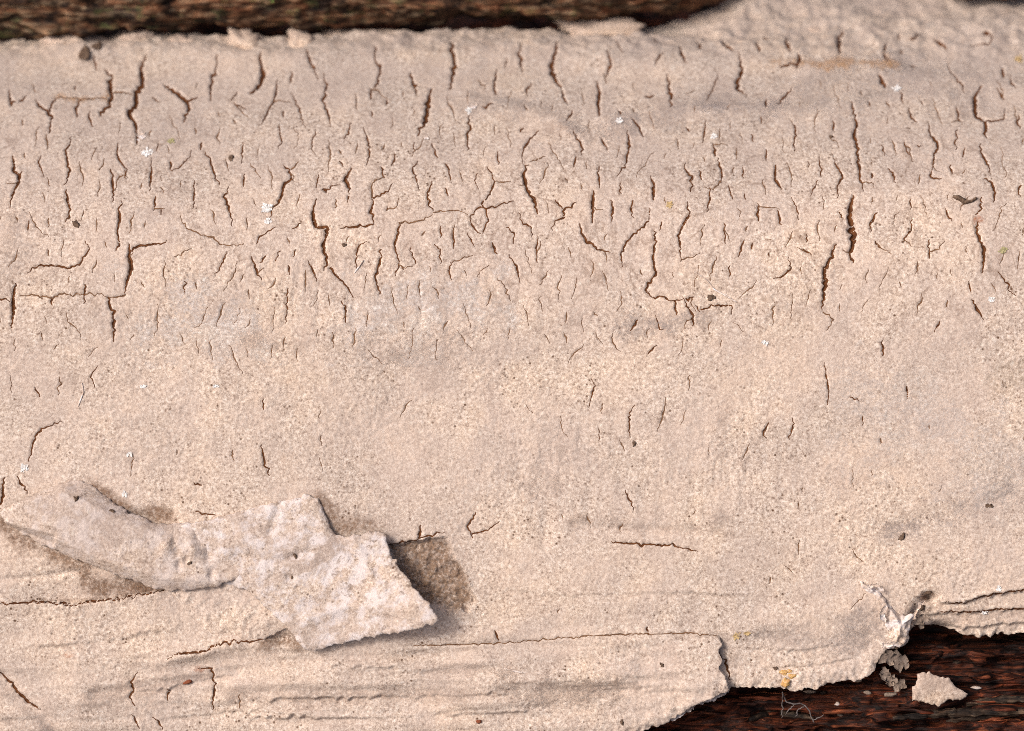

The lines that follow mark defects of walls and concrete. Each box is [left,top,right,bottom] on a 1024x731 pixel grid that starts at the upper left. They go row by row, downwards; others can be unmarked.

crack [0,31,1024,429]
crack [0,421,62,505]
crack [588,379,635,451]
crack [742,418,795,460]
crack [824,366,882,443]
crack [611,490,698,552]
crack [414,610,730,680]
peeling [860,581,929,649]
crack [941,589,1024,613]